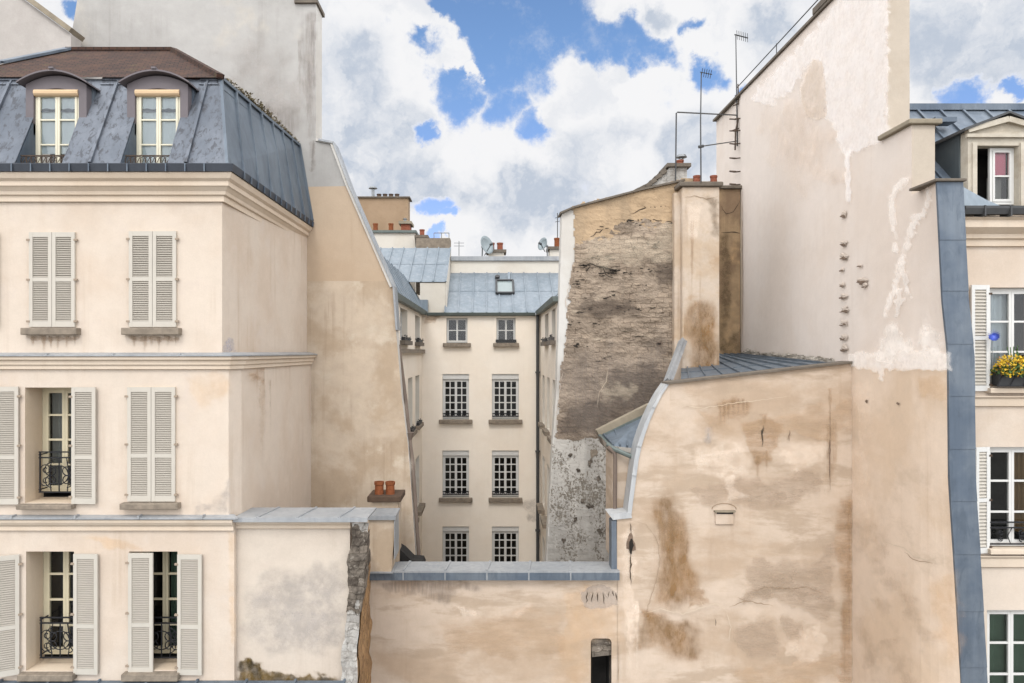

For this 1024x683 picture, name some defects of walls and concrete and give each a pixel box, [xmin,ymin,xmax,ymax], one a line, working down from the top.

water stain [691,305,719,367]
flaking render [548,218,672,561]
crack [826,416,834,475]
water stain [655,501,702,602]
spalling [358,563,373,683]
flaking render [582,585,617,609]
water stain [645,612,695,657]